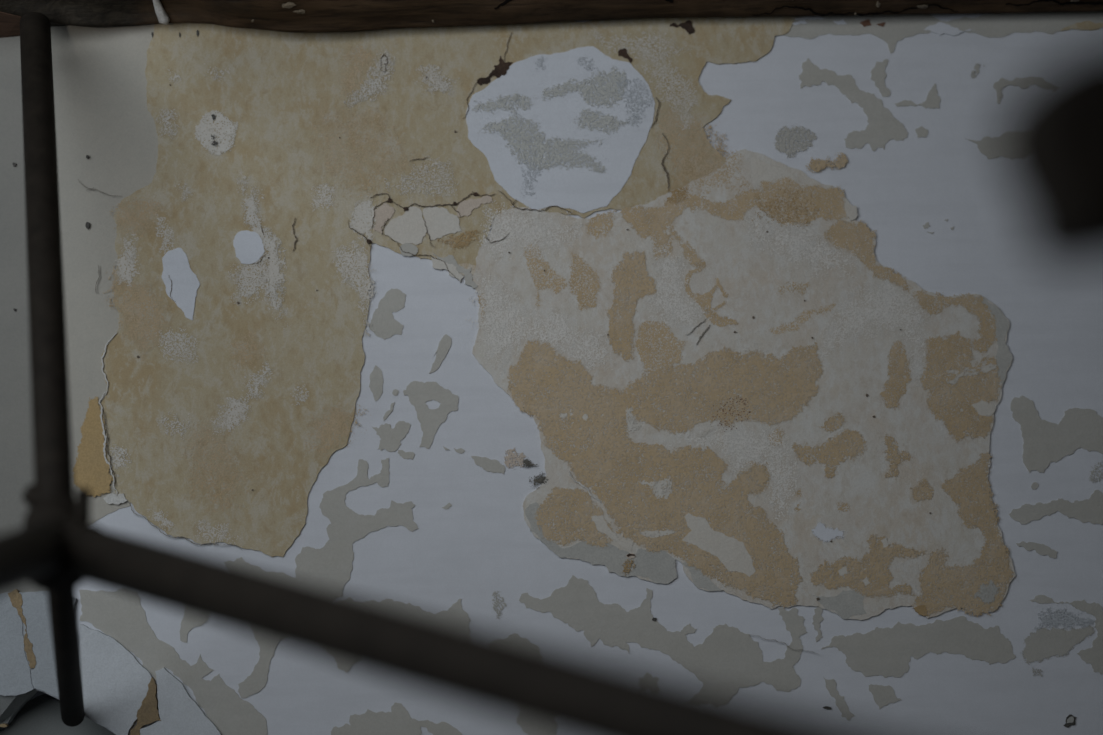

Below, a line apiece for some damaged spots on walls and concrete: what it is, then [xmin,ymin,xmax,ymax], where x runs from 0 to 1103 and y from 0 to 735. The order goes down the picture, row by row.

crack [348,190,571,281]
flaking render [99,12,1103,642]
flaking render [519,373,807,696]
flaking render [822,616,1016,678]
flaking render [1022,595,1103,676]
flaking render [869,684,901,709]